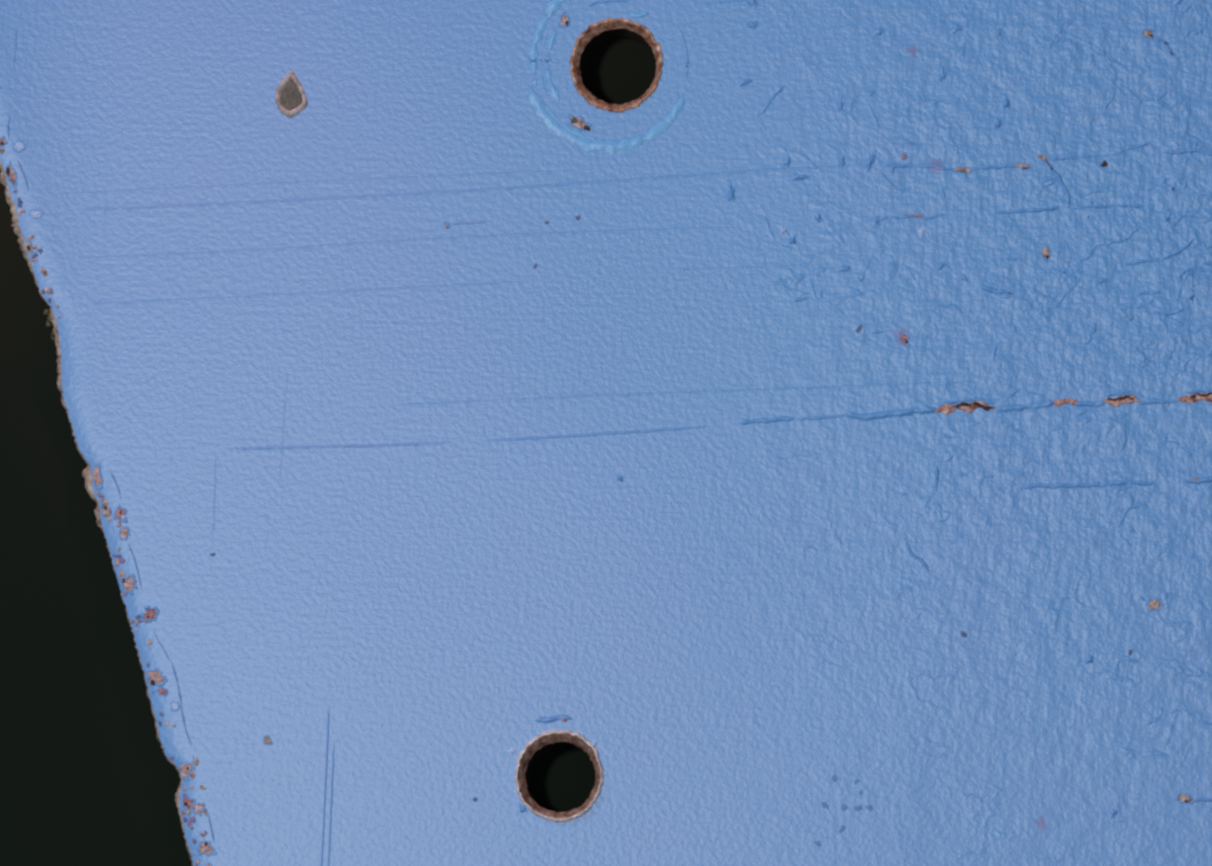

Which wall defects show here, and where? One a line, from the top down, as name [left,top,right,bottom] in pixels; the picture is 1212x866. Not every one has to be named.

peeling [0,136,44,219]
peeling [24,234,60,318]
crack [483,388,1212,441]
crack [1018,476,1212,491]
peeling [92,462,138,597]
peeling [131,605,160,646]
peeling [144,662,180,727]
peeling [170,756,217,866]